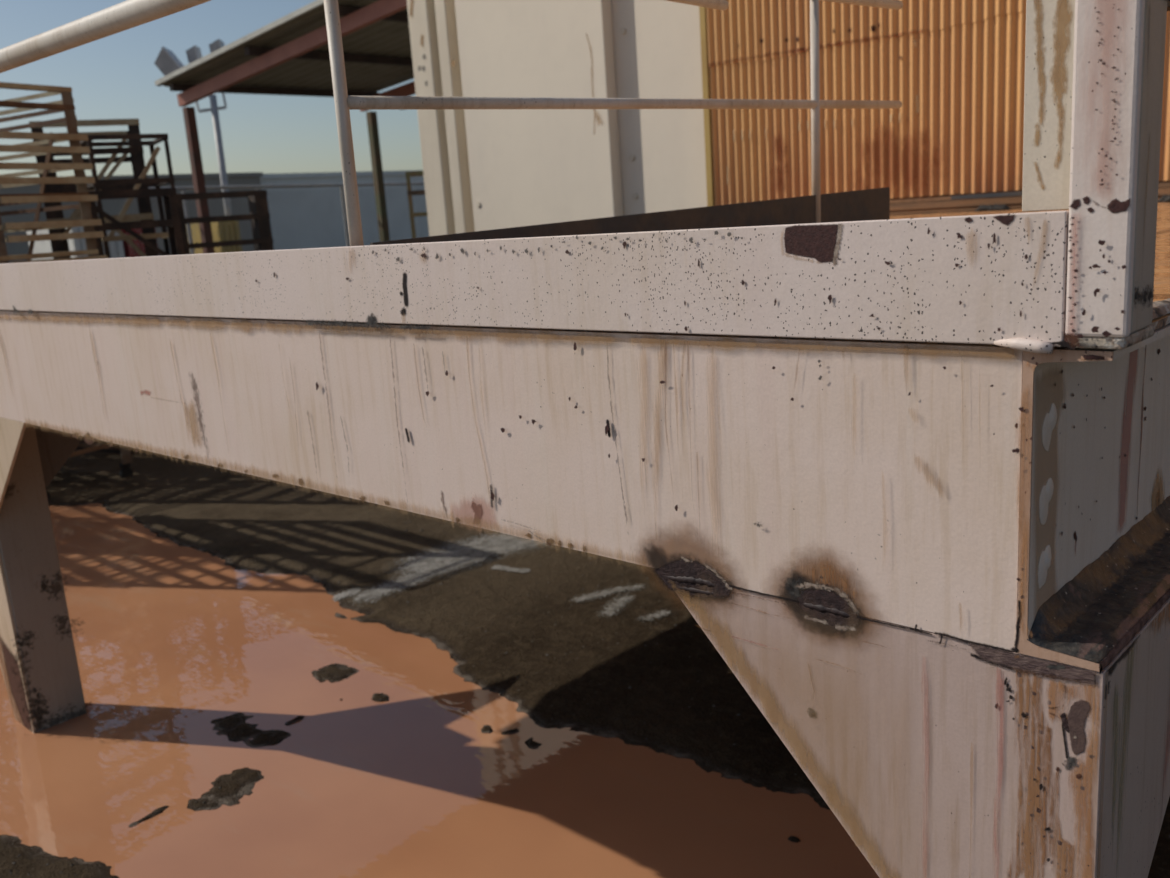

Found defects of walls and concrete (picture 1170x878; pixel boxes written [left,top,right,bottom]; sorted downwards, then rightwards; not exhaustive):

corrosion [1034,0,1072,166]
corrosion [1119,349,1146,527]
corrosion [970,644,1099,878]